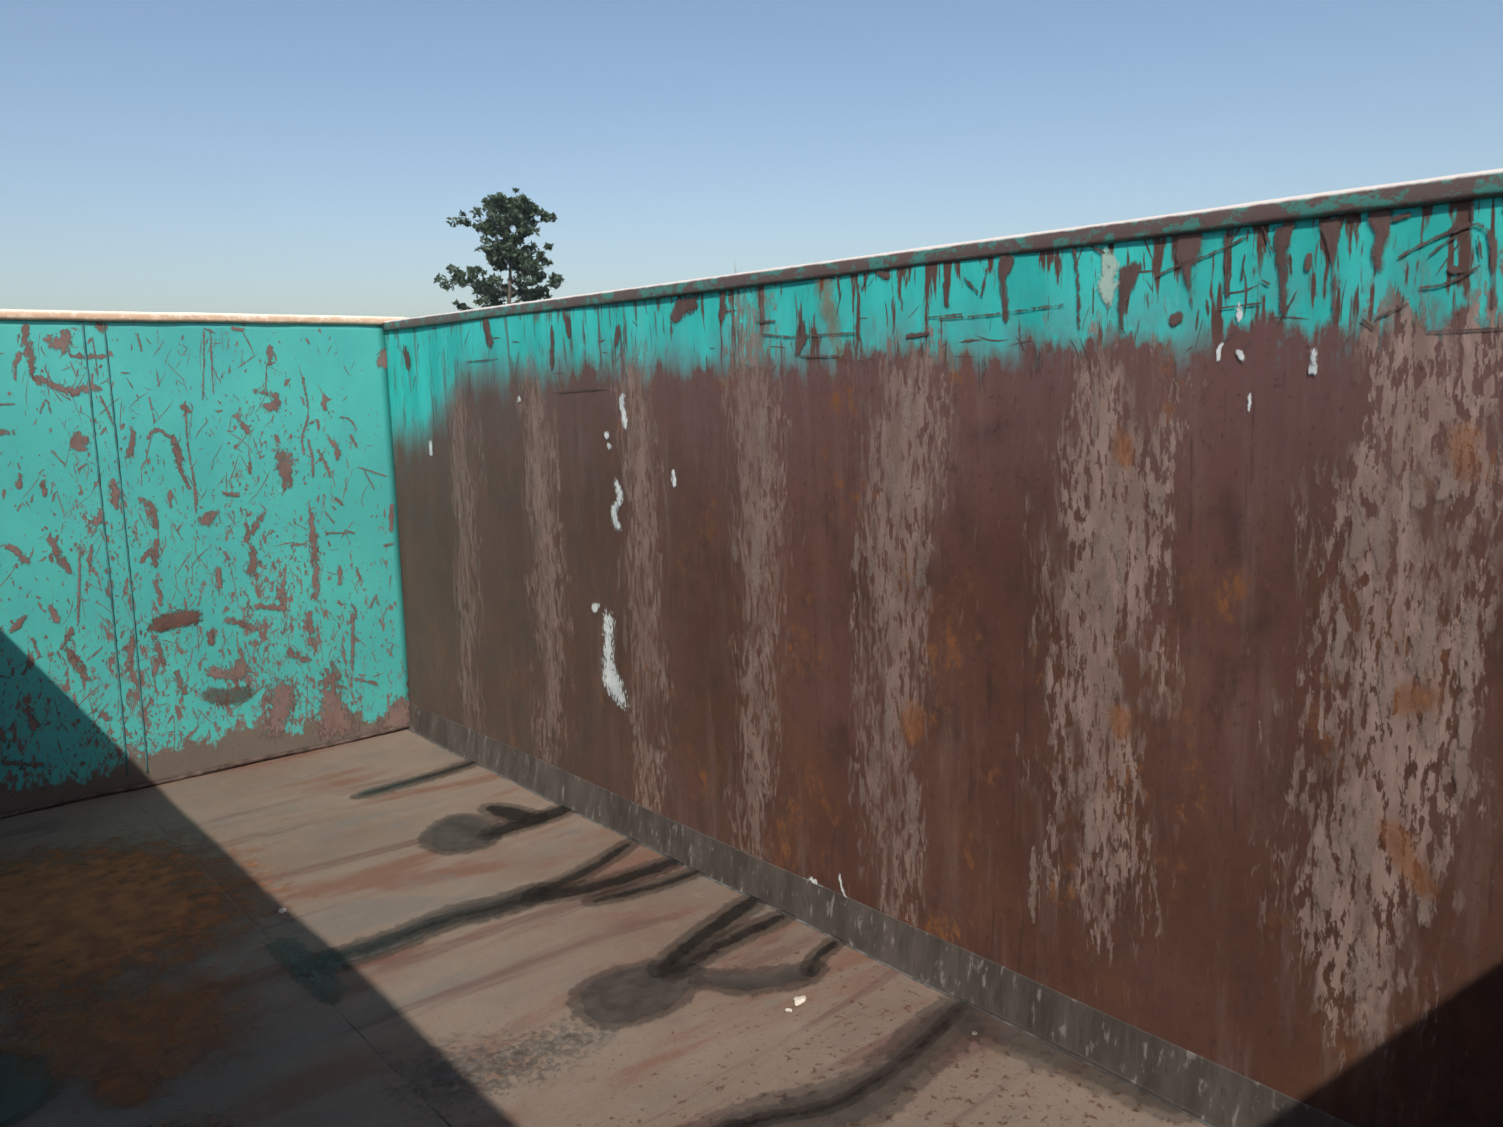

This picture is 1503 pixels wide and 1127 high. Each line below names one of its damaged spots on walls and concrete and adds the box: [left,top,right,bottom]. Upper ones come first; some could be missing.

peeling [1097,248,1120,306]
rust [1447,221,1498,308]
rust [795,320,807,356]
spalling [149,608,203,633]
spalling [203,686,254,705]
water stain [428,805,571,852]
water stain [578,895,839,1024]
water stain [708,997,1184,1127]